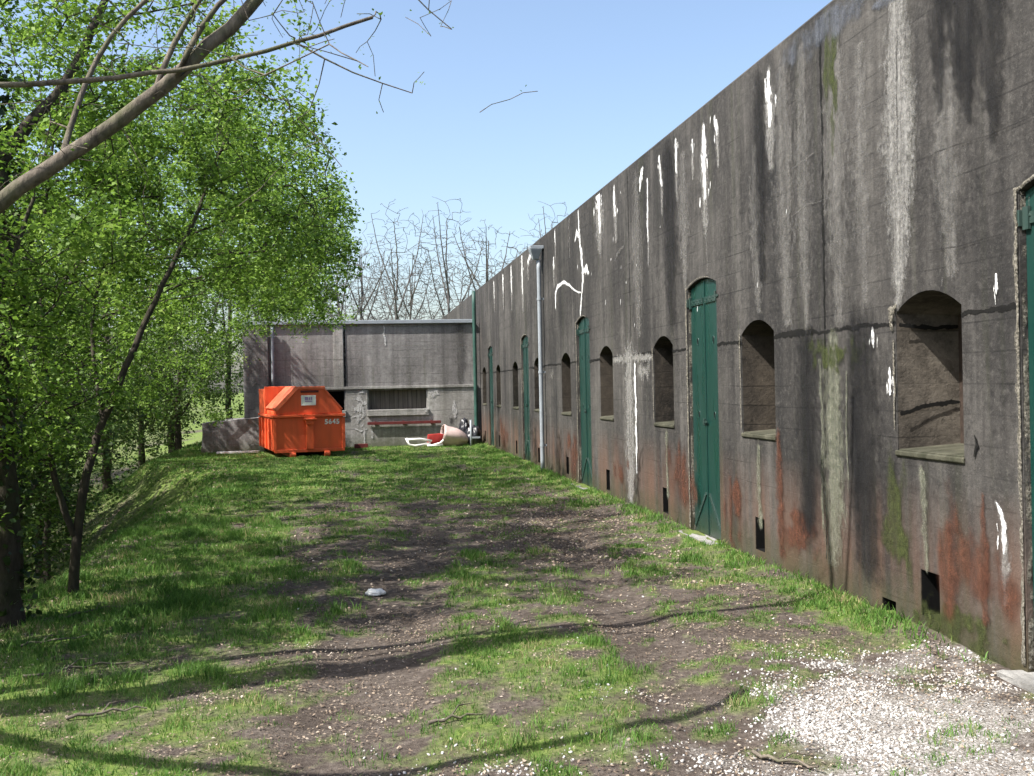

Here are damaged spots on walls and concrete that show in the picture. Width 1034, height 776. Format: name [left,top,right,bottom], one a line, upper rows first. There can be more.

leakage [931,0,1004,166]
leakage [553,213,589,316]
leakage [593,190,618,254]
leakage [635,116,719,322]
leakage [754,48,804,297]
leakage [796,265,878,575]
leakage [996,503,1009,604]